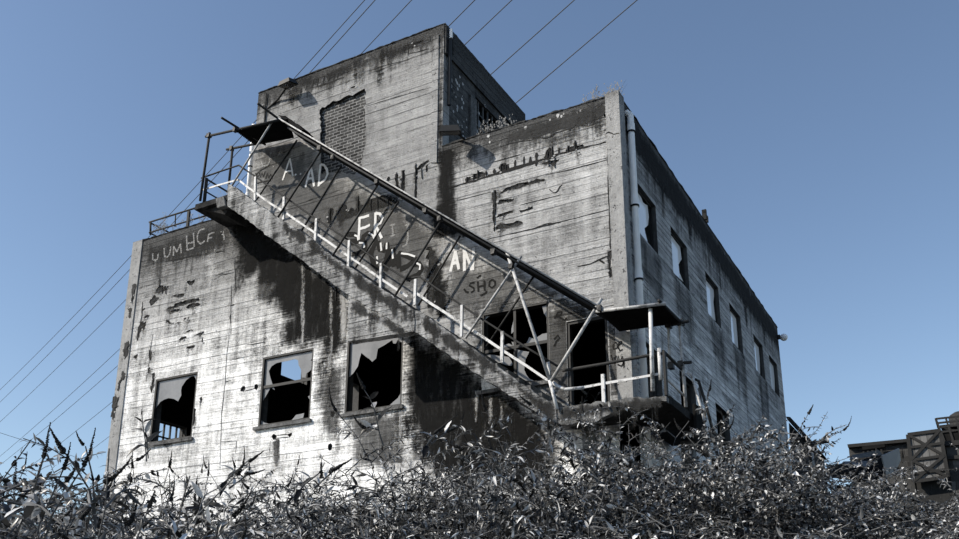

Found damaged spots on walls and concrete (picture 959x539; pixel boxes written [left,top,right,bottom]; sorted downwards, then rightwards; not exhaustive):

spalling [111,278,205,420]